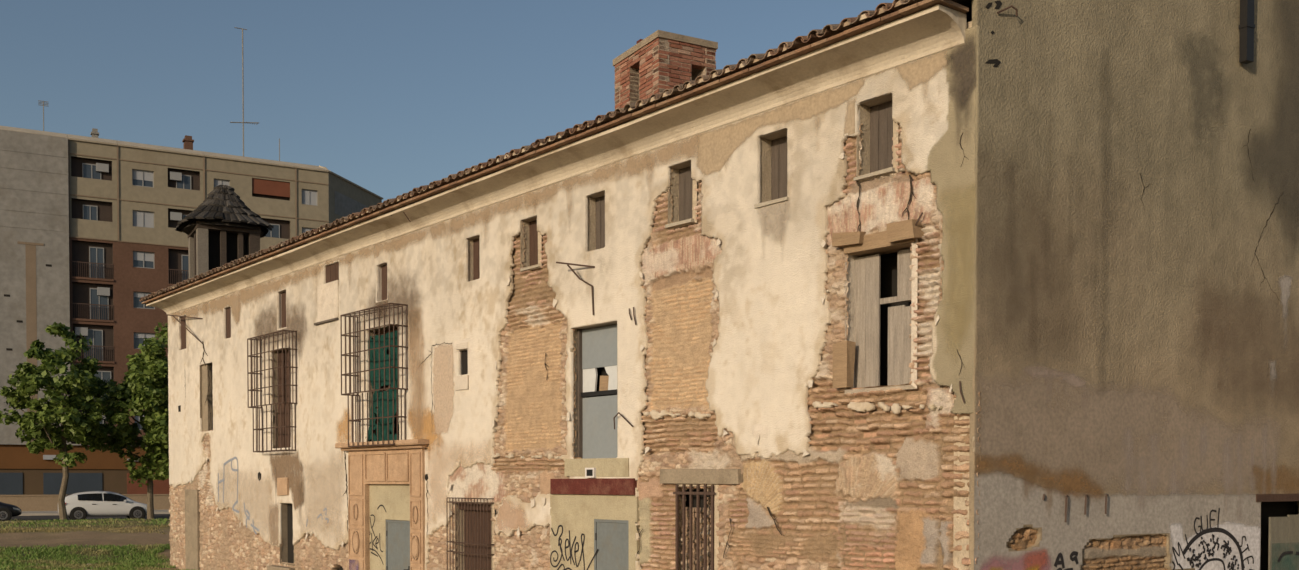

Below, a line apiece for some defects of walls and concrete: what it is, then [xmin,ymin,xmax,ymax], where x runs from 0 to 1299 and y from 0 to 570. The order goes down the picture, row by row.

damp [1253,0,1299,217]
spalling [637,51,982,570]
crack [1243,129,1284,300]
damp [1280,276,1291,316]
spalling [427,223,582,570]
spalling [169,430,349,570]
spalling [1007,527,1038,551]
spalling [1081,534,1168,570]